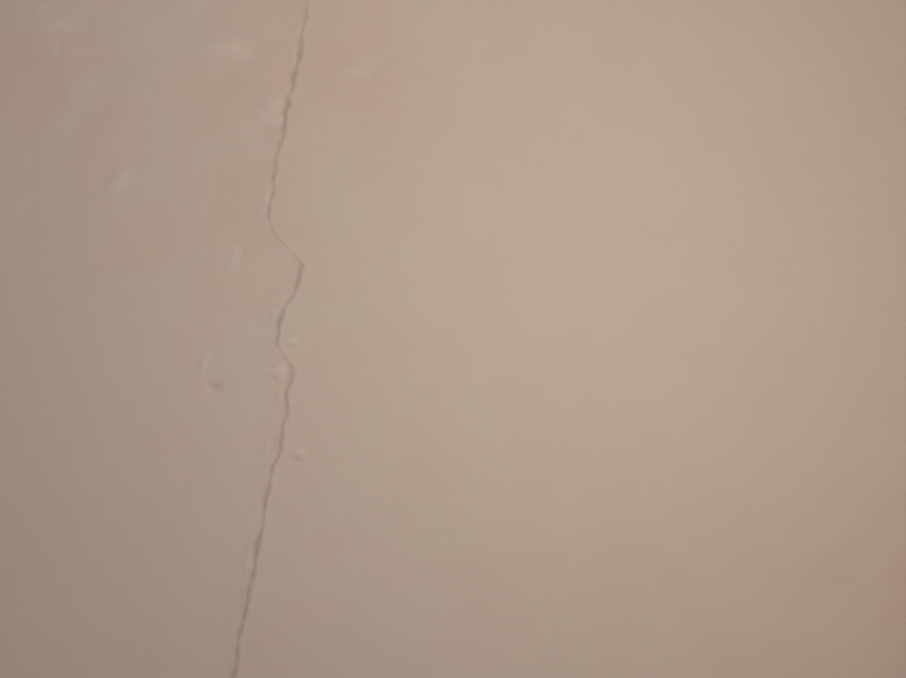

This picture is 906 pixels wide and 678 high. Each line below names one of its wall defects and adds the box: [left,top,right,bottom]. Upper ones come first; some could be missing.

crack [226,0,311,678]